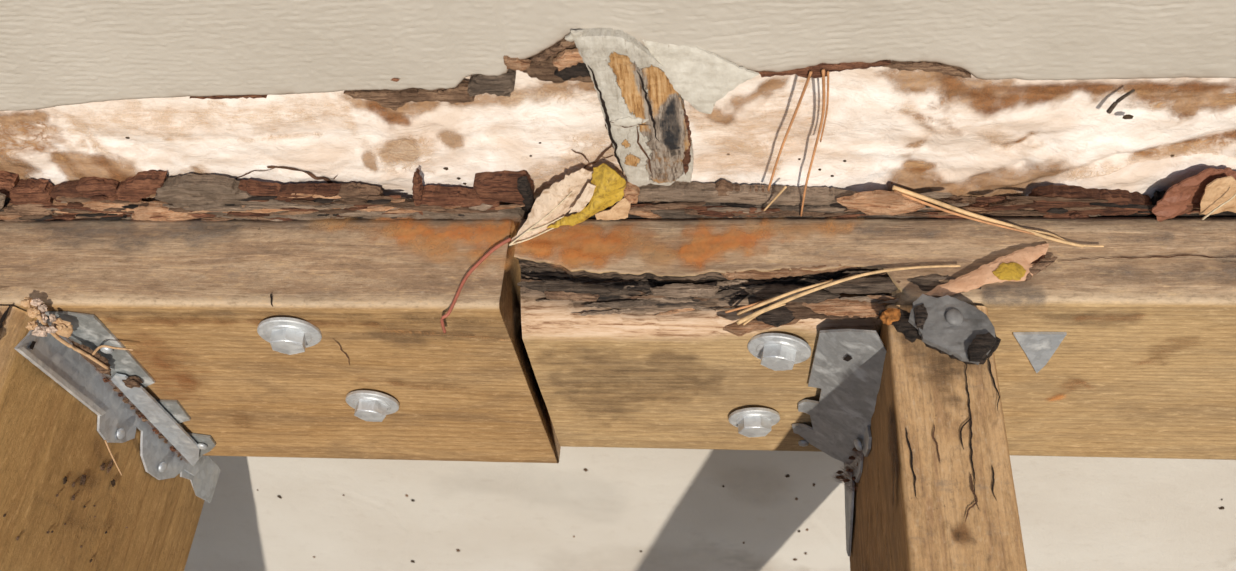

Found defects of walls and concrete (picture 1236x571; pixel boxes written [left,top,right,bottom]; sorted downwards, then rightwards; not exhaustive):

water stain [0,112,136,182]
water stain [327,81,596,171]
water stain [531,137,622,199]
peeling [573,28,759,187]
water stain [708,79,812,173]
water stain [887,142,1114,199]
water stain [883,69,1236,119]
water stain [1133,131,1236,160]
rust [387,221,512,261]
rust [518,222,768,267]
crack [0,287,10,329]
crack [906,357,1000,522]